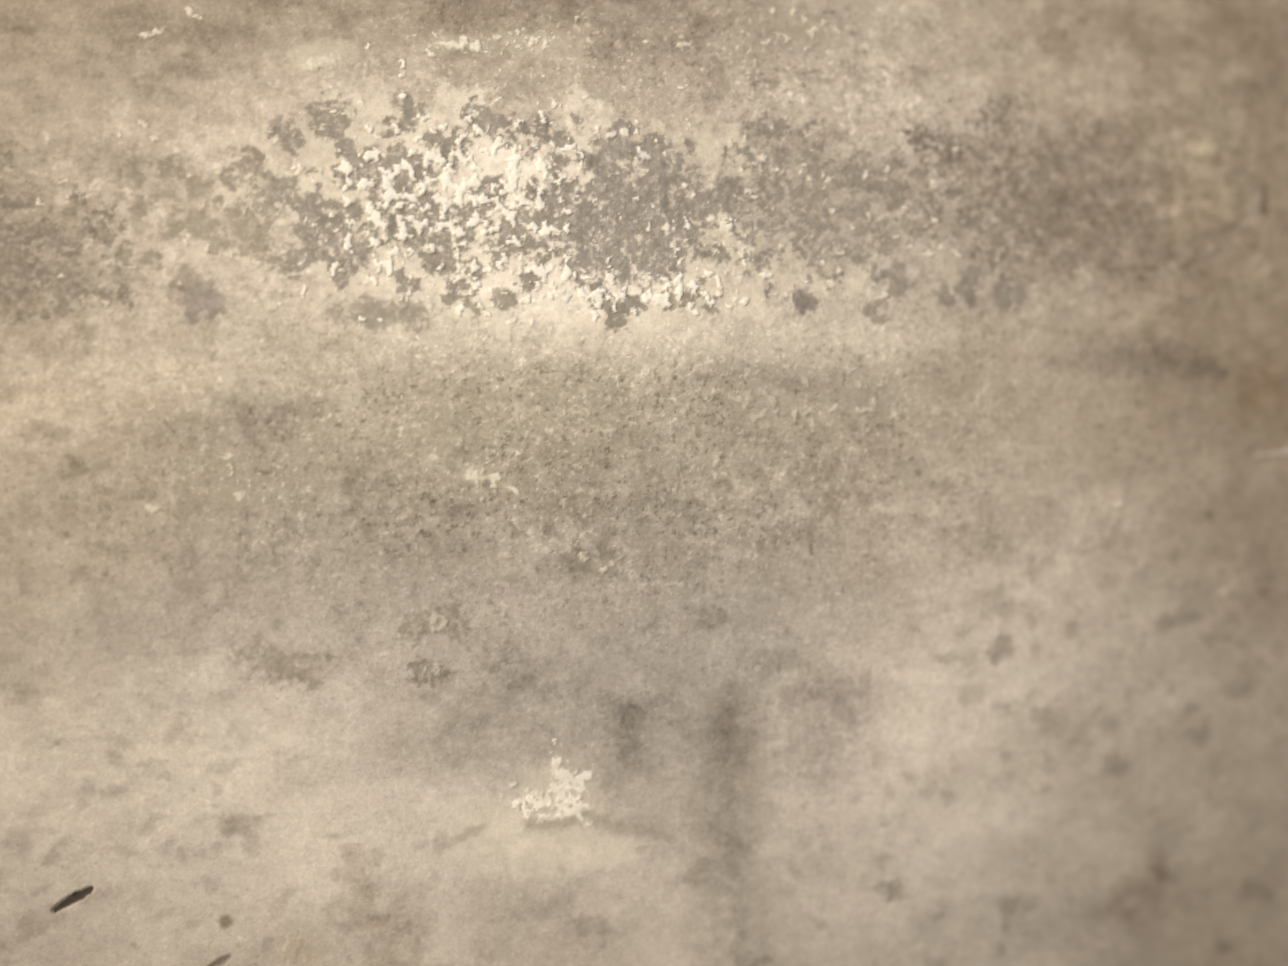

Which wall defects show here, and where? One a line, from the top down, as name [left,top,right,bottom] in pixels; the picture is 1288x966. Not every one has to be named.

peeling [35,0,1037,433]
leakage [215,911,237,933]
leakage [223,591,911,966]